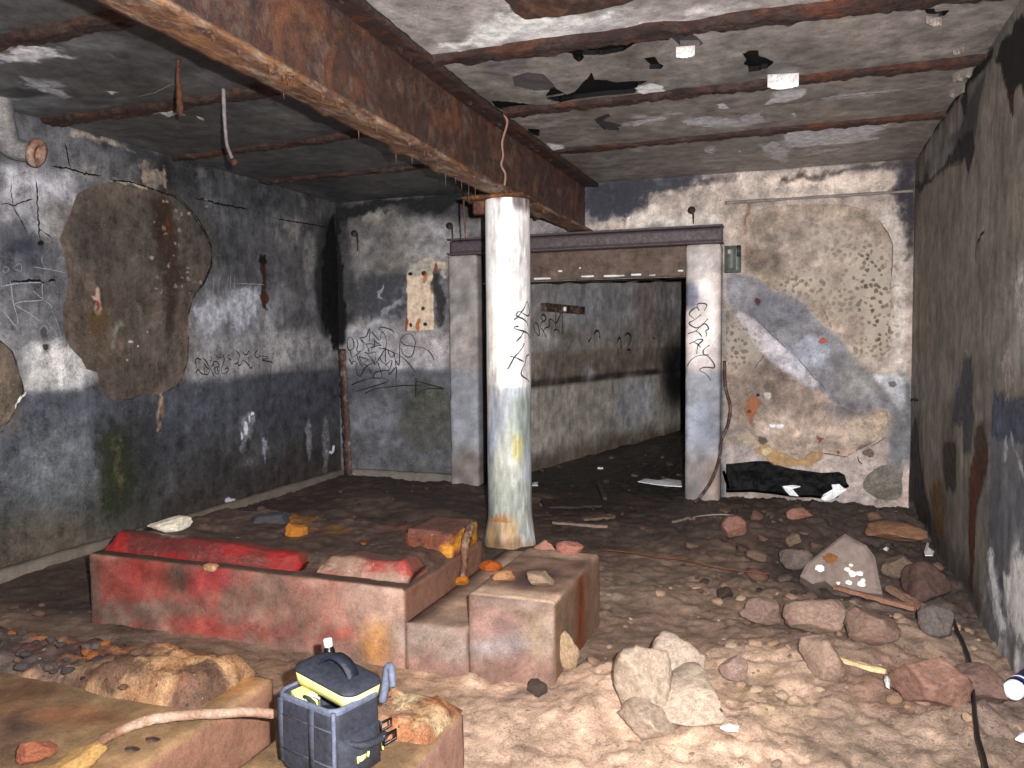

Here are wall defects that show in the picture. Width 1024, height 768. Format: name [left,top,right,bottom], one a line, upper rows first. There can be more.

spalling [492,72,665,110]
peeling [683,50,807,127]
water stain [923,14,1024,149]
crack [3,144,248,290]
crack [275,218,327,228]
spalling [60,162,213,401]
corrosion [259,255,269,310]
flaking render [405,261,437,331]
spalling [726,310,903,501]
water stain [909,419,931,530]
water stain [943,355,973,492]
water stain [987,548,1024,642]